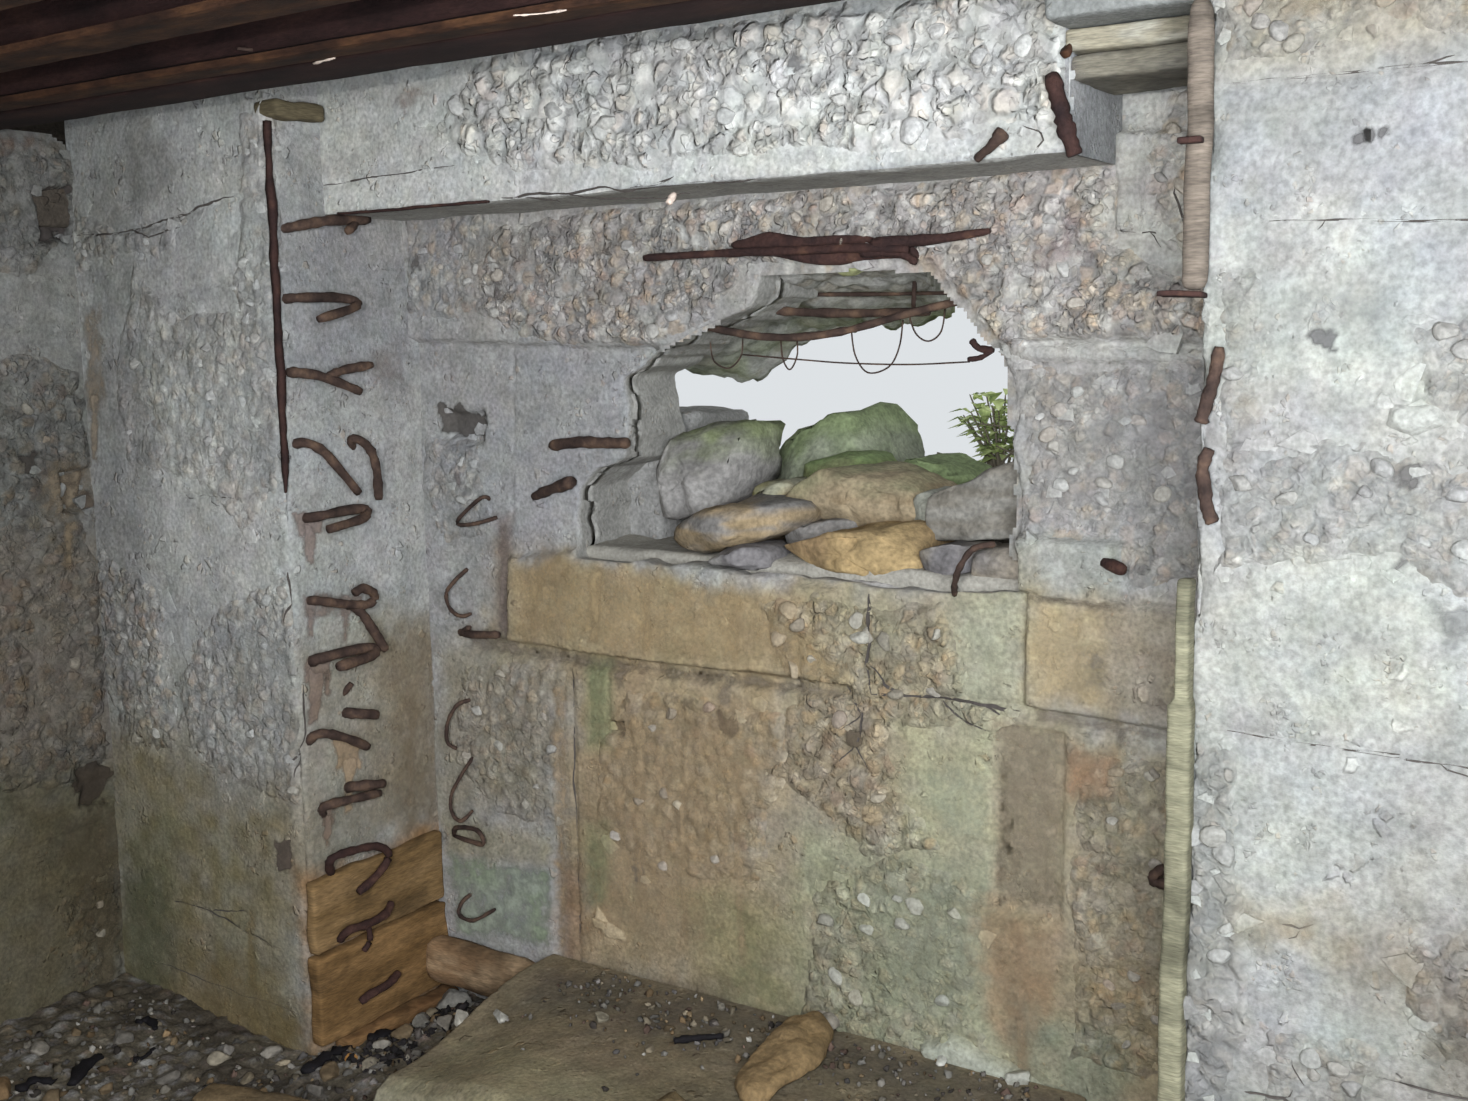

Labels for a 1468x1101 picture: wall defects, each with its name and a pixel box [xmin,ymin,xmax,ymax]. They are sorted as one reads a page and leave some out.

spalling [414,0,1076,178]
corrosion [974,127,1009,163]
corrosion [1045,71,1082,158]
spalling [1145,89,1188,250]
spalling [1353,127,1388,145]
crack [71,197,230,251]
corrosion [1157,290,1207,298]
spalling [405,163,1468,598]
corrosion [292,512,322,564]
corrosion [305,594,361,640]